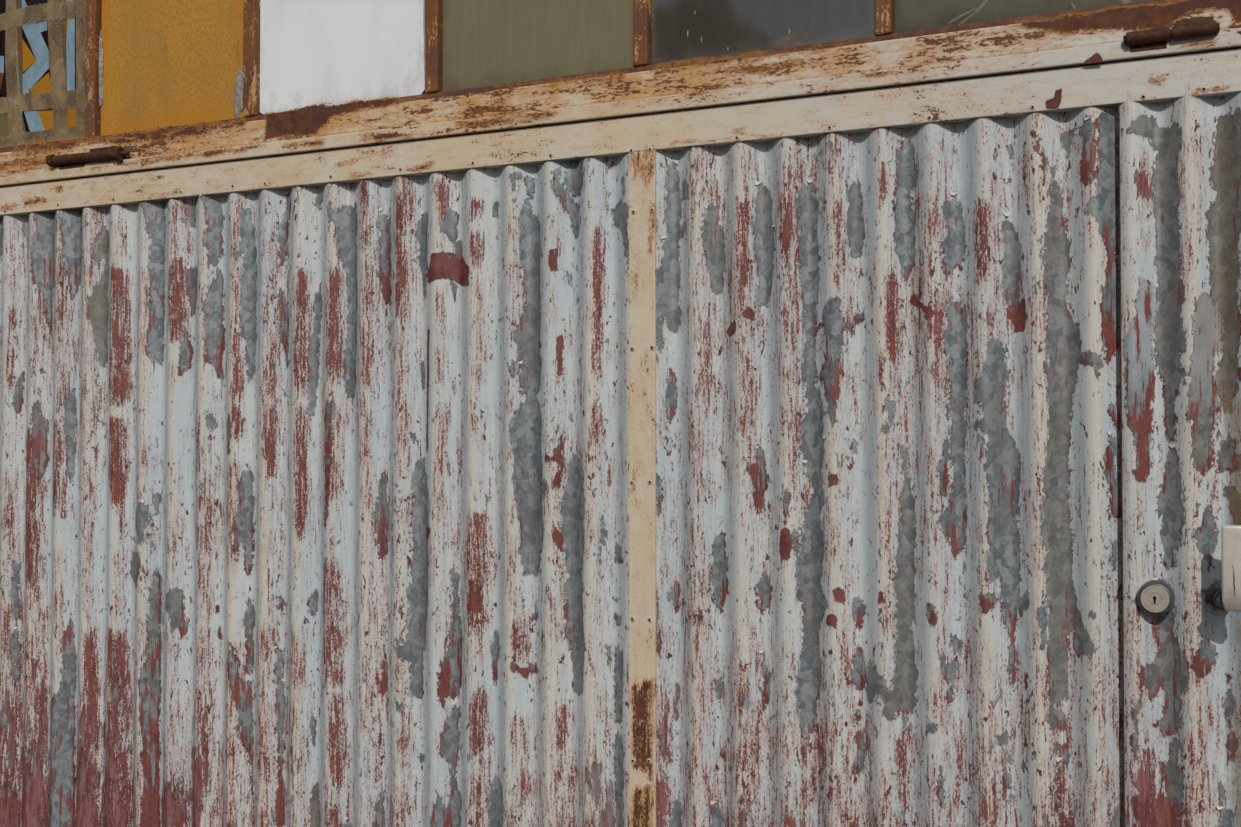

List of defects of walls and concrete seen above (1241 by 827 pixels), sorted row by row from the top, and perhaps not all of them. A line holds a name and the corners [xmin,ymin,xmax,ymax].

rust [1017,0,1241,34]
rust [2,185,63,210]
rust [0,95,422,178]
rust [456,110,556,128]
peeling [550,158,585,237]
rust [631,150,654,185]
peeling [656,160,690,518]
peeling [0,178,499,827]
peeling [508,171,629,753]
peeling [701,179,939,815]
peeling [378,329,538,827]
rust [629,680,655,827]